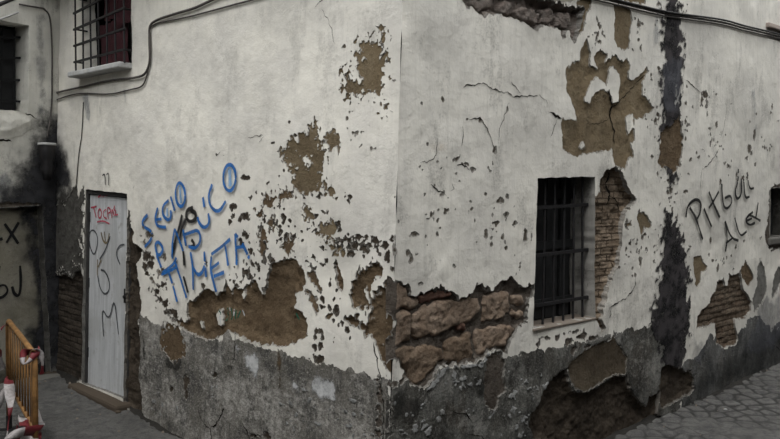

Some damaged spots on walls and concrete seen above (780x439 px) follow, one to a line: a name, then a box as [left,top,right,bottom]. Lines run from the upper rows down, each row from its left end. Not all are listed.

spalling [123,0,724,439]
crack [462,83,562,147]
leakage [658,0,686,141]
leakage [664,166,680,188]
peeling [745,113,772,166]
leakage [649,202,693,372]
spalling [688,237,780,348]